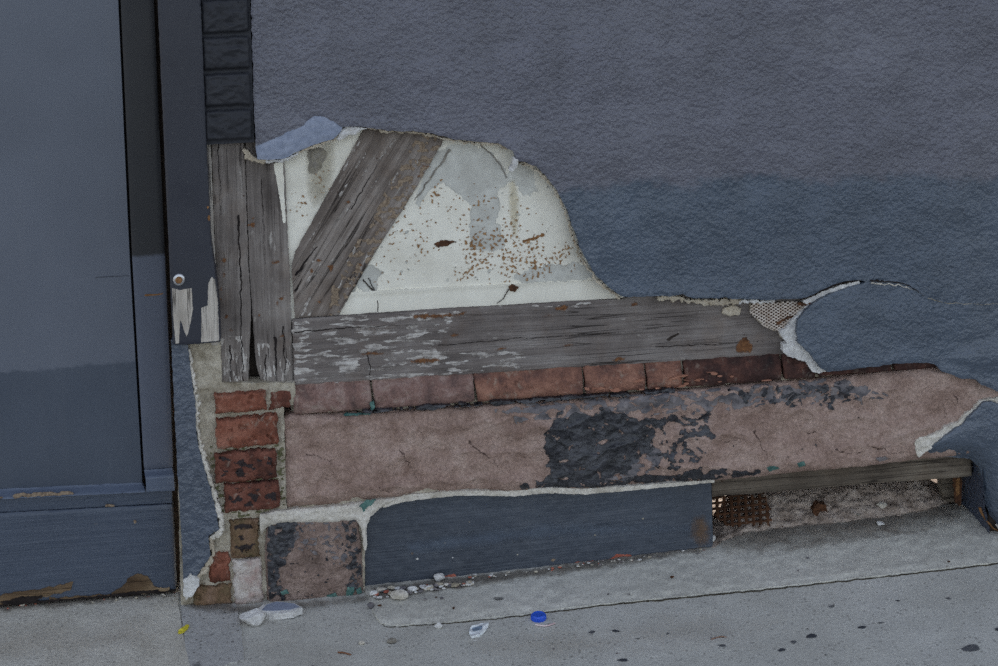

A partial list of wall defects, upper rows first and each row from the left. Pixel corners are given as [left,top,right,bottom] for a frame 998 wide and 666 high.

peeling [242,116,620,308]
corrosion [376,179,581,292]
crack [800,279,996,305]
peeling [0,224,525,607]
peeling [344,281,888,490]
flaking render [914,396,998,457]
peeling [575,550,685,567]